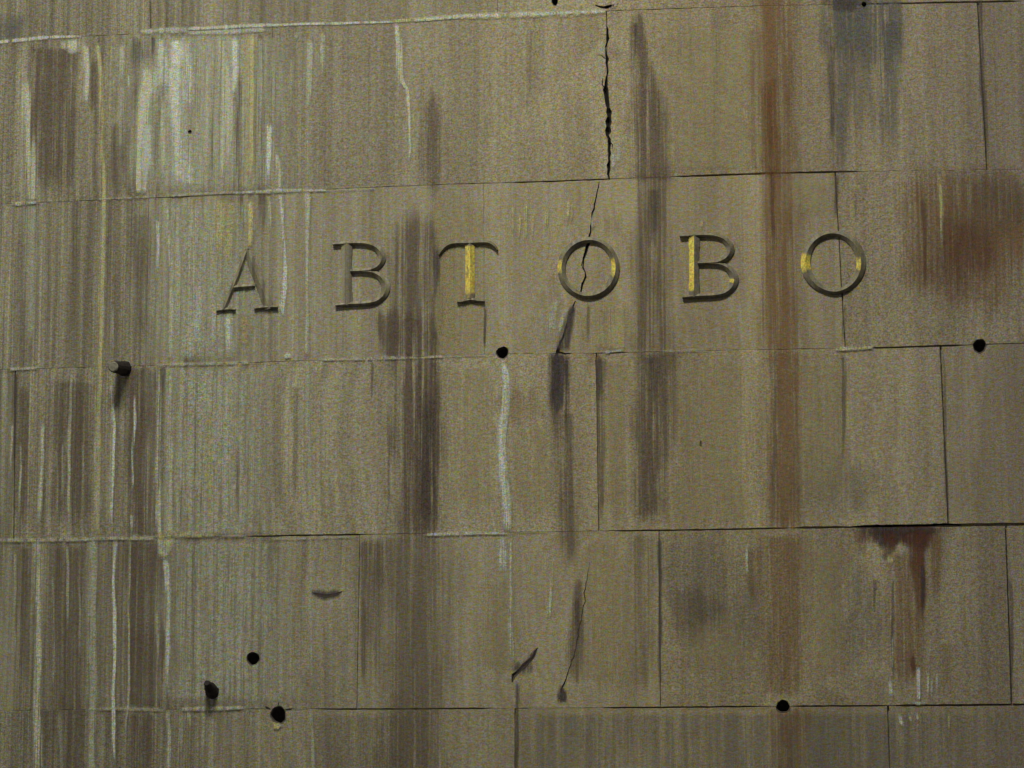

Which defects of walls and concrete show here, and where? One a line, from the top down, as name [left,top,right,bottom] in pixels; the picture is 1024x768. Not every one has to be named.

water stain [0,4,616,768]
crack [556,26,613,354]
water stain [587,15,675,515]
corrosion [762,0,791,349]
water stain [833,0,900,54]
crack [559,563,590,699]
corrosion [864,527,934,609]